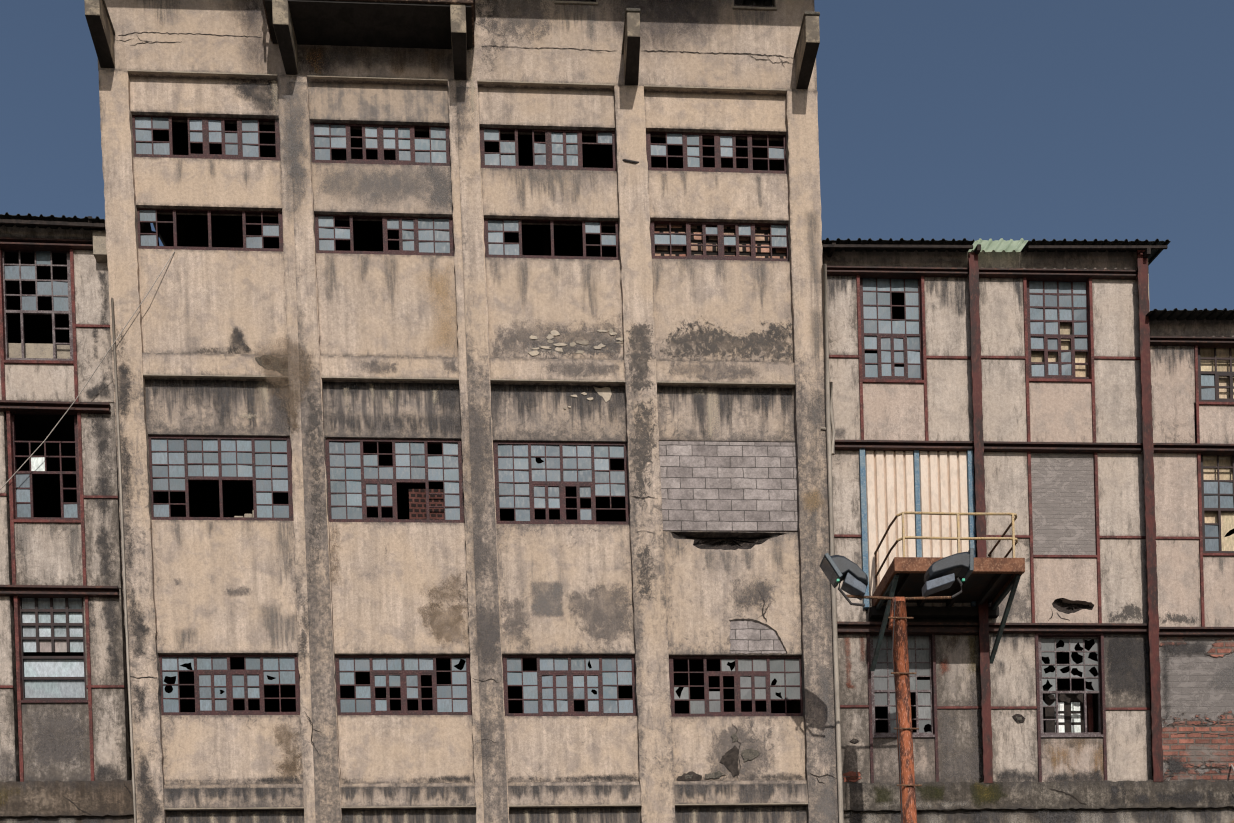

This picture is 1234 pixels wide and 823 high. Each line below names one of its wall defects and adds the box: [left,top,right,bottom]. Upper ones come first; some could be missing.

leakage [86,272,134,416]
peeling [528,328,624,356]
leakage [150,328,490,583]
leakage [629,363,791,506]
leakage [87,414,149,679]
spalling [670,532,784,550]
leakage [420,545,656,663]
flaking render [729,618,787,654]
spalling [1052,598,1094,614]
leakage [133,685,146,721]
flaking render [677,733,760,781]
flaking render [1161,710,1234,782]